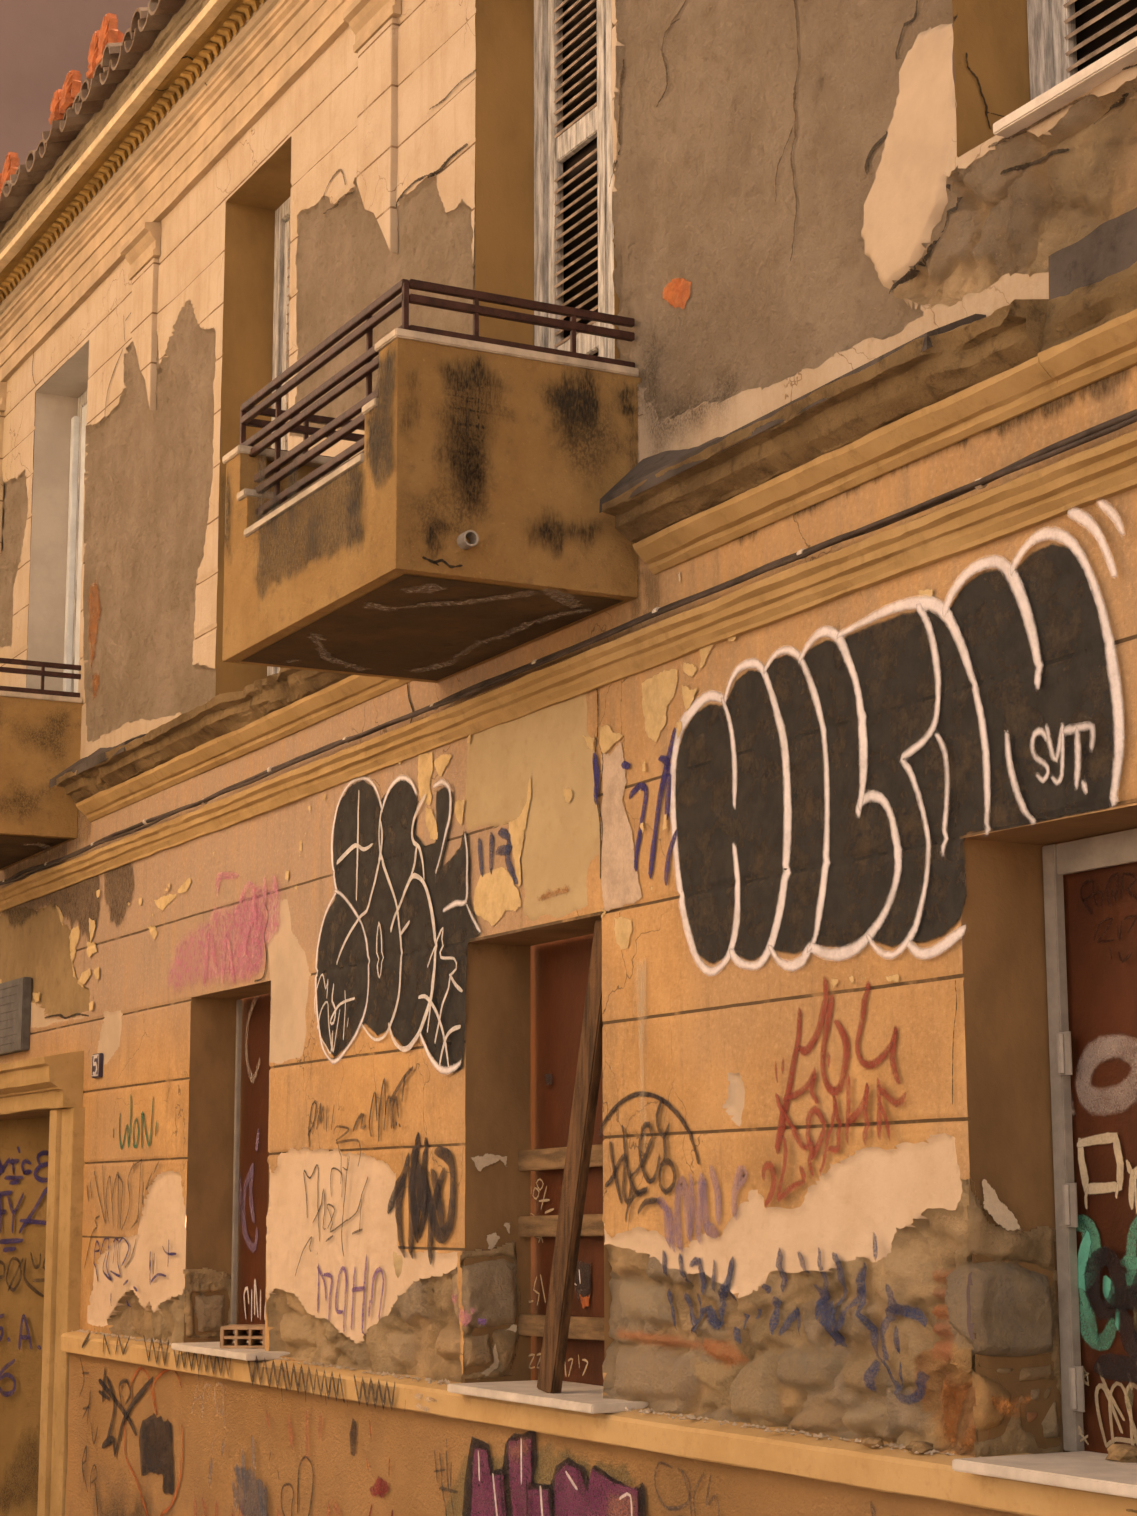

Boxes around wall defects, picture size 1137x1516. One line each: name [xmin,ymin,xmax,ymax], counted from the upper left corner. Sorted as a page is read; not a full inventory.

flaking render [83,299,218,742]
leakage [255,352,394,596]
flaking render [289,174,480,437]
leakage [428,358,501,552]
leakage [534,518,594,551]
leakage [552,371,605,461]
flaking render [612,0,1137,420]
crack [889,184,962,294]
crack [966,53,1137,175]
peeling [87,1171,231,1343]
peeling [266,1147,522,1383]
flaking render [602,1133,1063,1457]